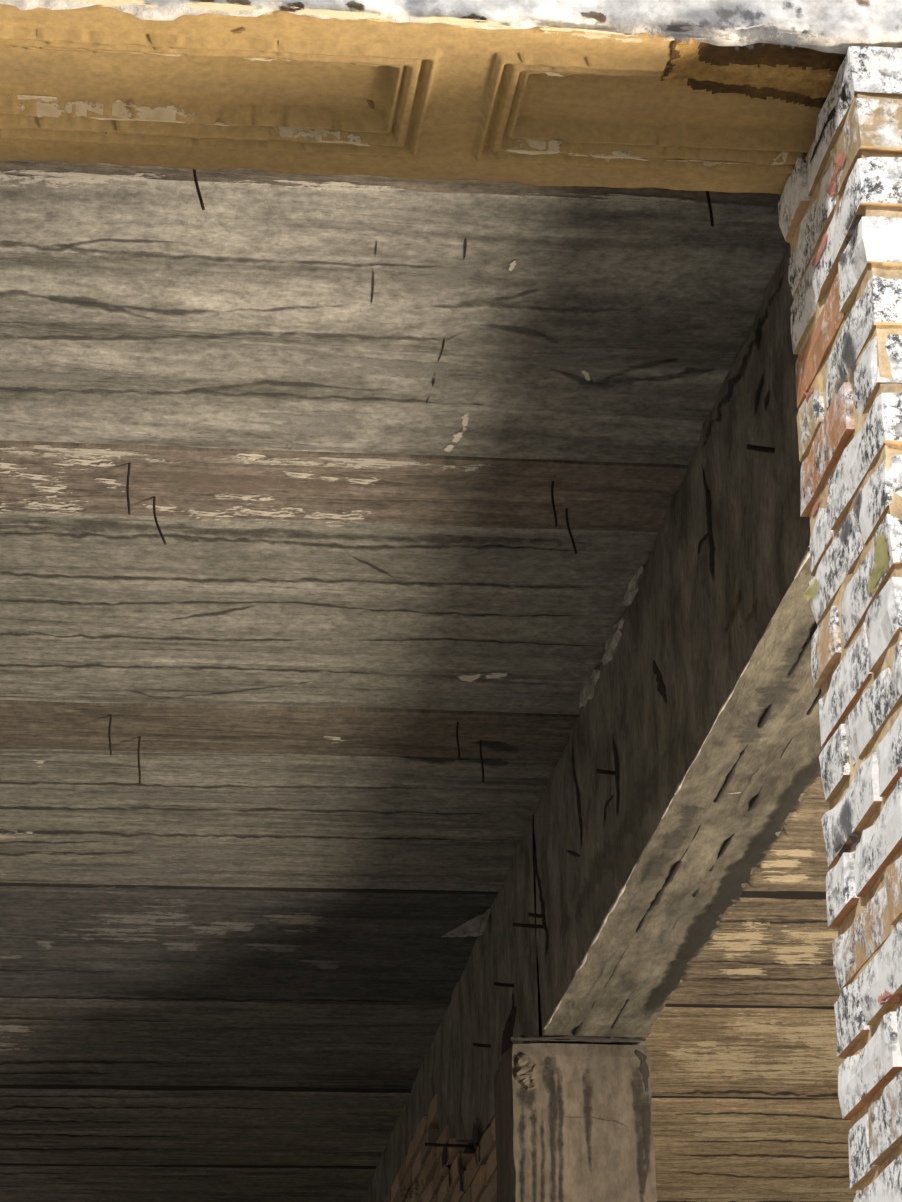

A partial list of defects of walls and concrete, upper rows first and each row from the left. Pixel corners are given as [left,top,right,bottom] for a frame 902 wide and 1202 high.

peeling [70,0,157,8]
peeling [184,2,273,15]
peeling [294,7,391,22]
peeling [417,17,517,30]
peeling [539,26,647,42]
spalling [660,36,846,109]
peeling [8,94,230,126]
peeling [277,126,370,146]
peeling [505,139,650,163]
crack [0,290,614,404]